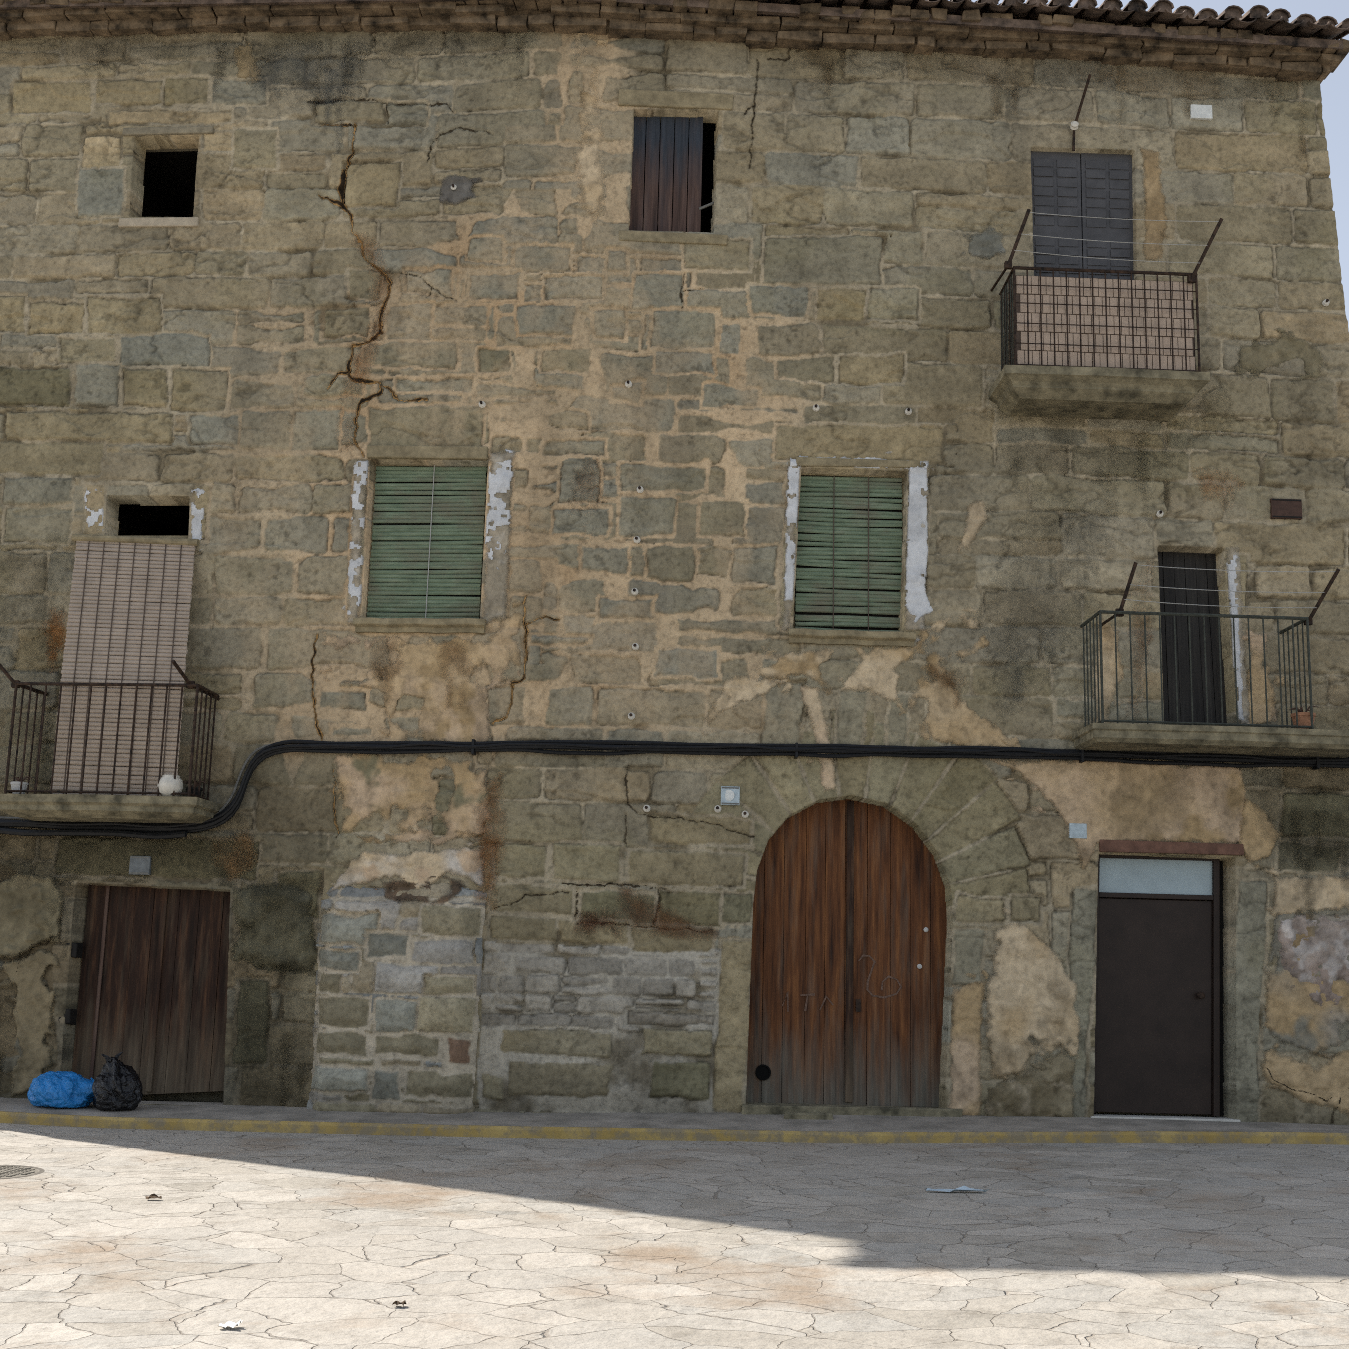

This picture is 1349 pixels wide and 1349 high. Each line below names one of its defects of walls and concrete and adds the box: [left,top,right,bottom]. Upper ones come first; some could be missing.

crack [308,98,489,457]
peeling [343,542,363,615]
peeling [351,460,368,529]
peeling [485,449,513,569]
crack [310,634,339,834]
flaking render [703,455,1349,1117]
flaking render [0,874,62,1096]